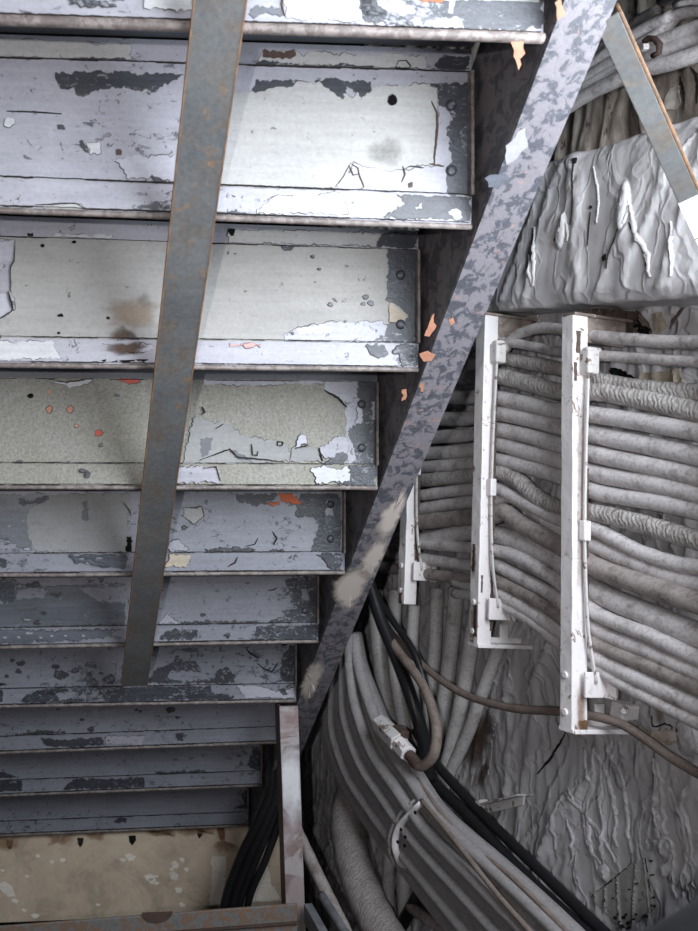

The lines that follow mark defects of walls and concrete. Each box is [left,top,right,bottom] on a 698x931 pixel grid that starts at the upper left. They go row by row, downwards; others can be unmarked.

peeling [0,36,184,97]
peeling [114,149,176,184]
peeling [217,49,472,222]
peeling [249,0,545,70]
peeling [485,128,528,189]
peeling [555,0,565,20]
peeling [0,332,60,361]
rust [147,0,248,685]
peeling [226,228,436,367]
peeling [177,379,405,608]
peeling [0,492,133,644]
peeling [22,576,324,719]